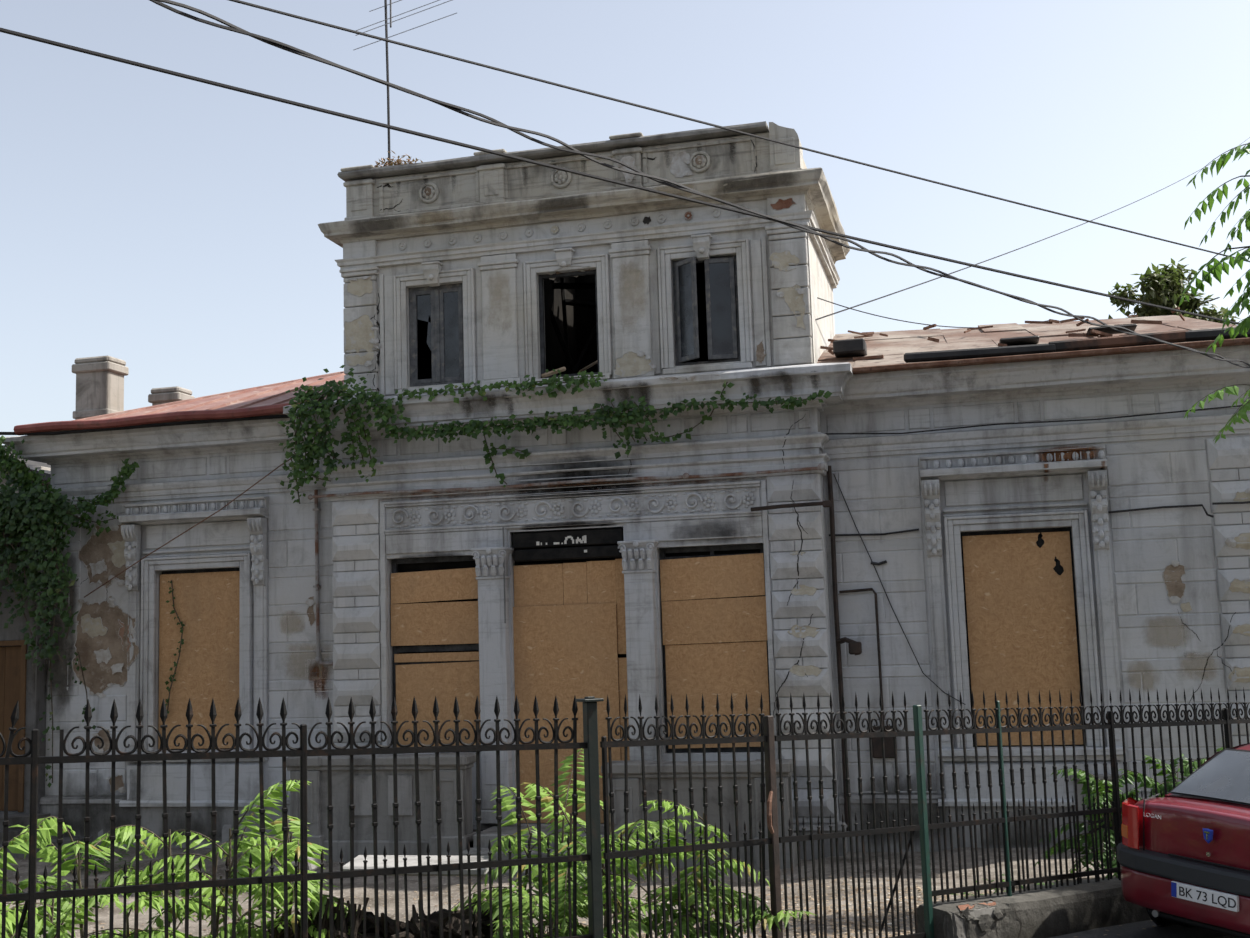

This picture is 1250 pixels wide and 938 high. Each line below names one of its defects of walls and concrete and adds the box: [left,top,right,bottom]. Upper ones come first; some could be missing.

peeling [344,314,381,367]
peeling [72,522,140,698]
crack [773,416,813,718]
peeling [1162,560,1193,612]
spalling [943,898,1011,938]